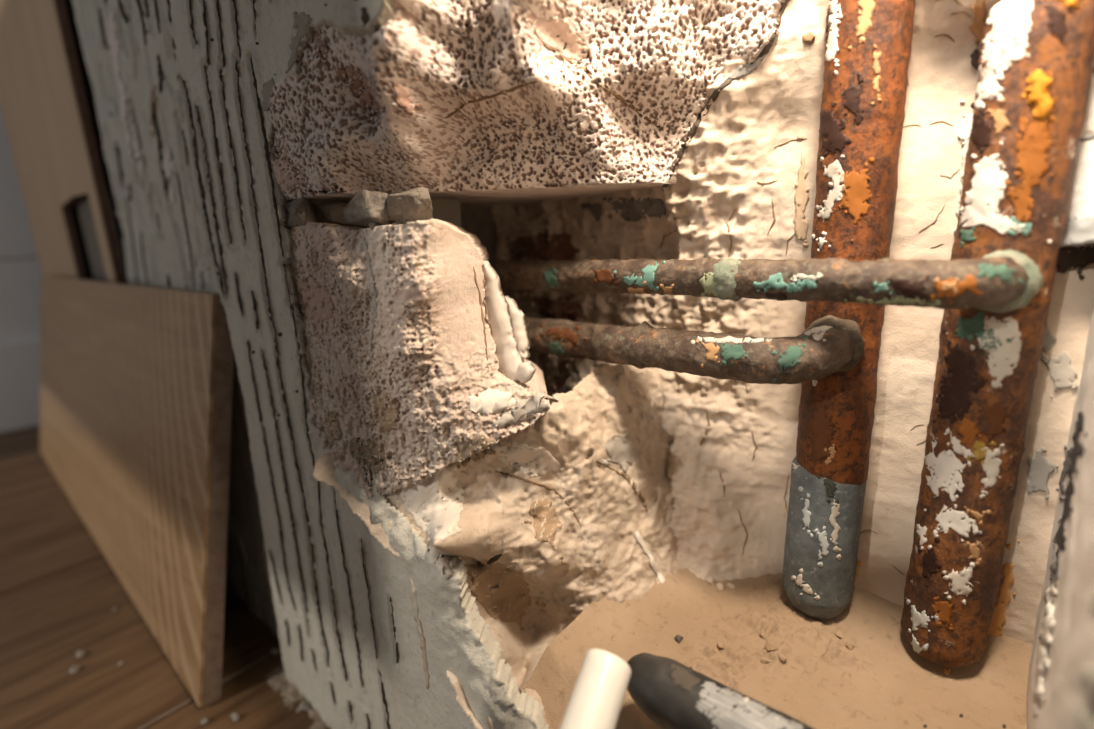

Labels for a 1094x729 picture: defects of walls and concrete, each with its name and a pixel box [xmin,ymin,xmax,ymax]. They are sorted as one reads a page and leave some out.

spalling [285,12,423,118]
crack [445,79,543,118]
crack [543,44,663,129]
corrosion [817,72,864,159]
corrosion [970,106,992,159]
corrosion [1004,69,1057,232]
corrosion [834,157,875,225]
spalling [483,0,1094,729]
spalling [330,435,393,477]
crack [495,471,581,526]
crack [585,457,648,512]
spalling [464,559,547,631]